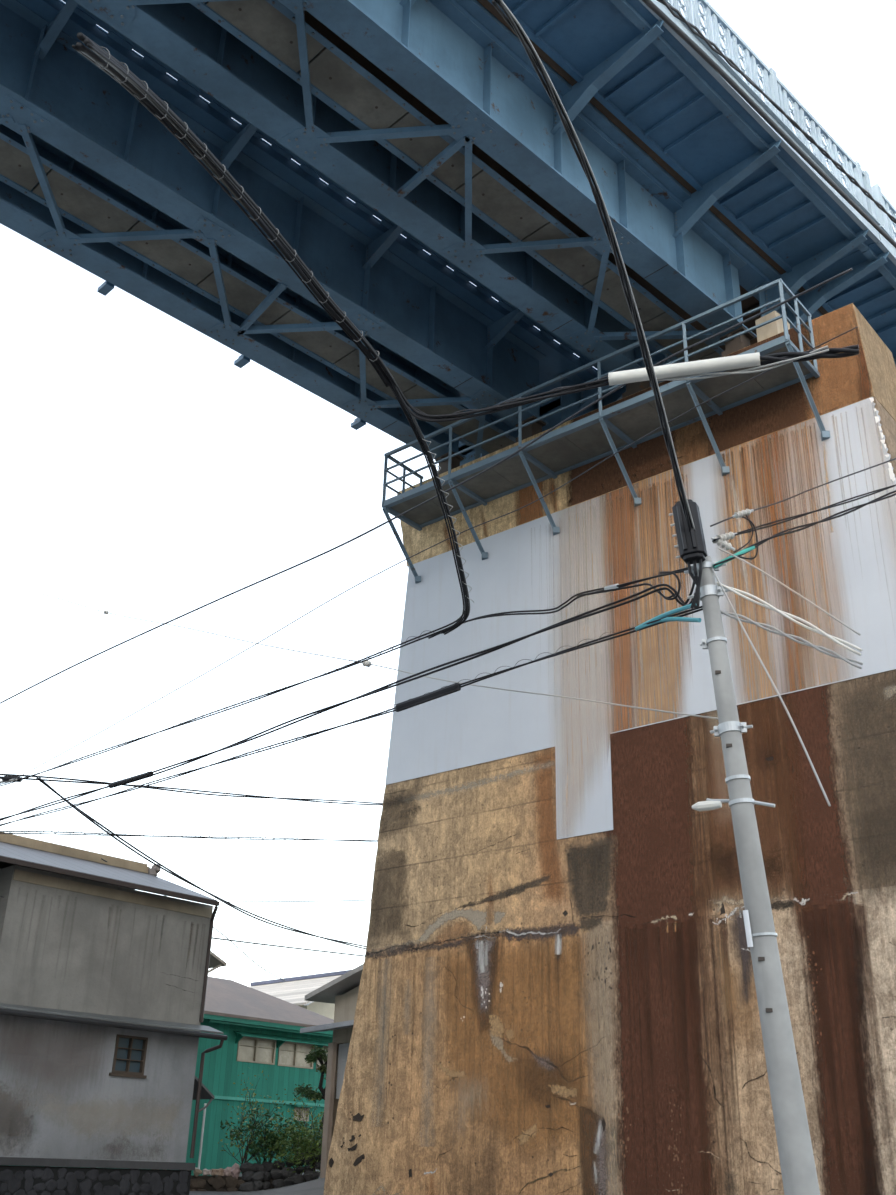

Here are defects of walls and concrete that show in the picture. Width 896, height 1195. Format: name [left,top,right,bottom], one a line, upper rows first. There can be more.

rust [517,305,884,1195]
water stain [712,906,751,999]
water stain [419,837,614,1195]
crack [699,1055,766,1104]
crack [701,1138,782,1192]